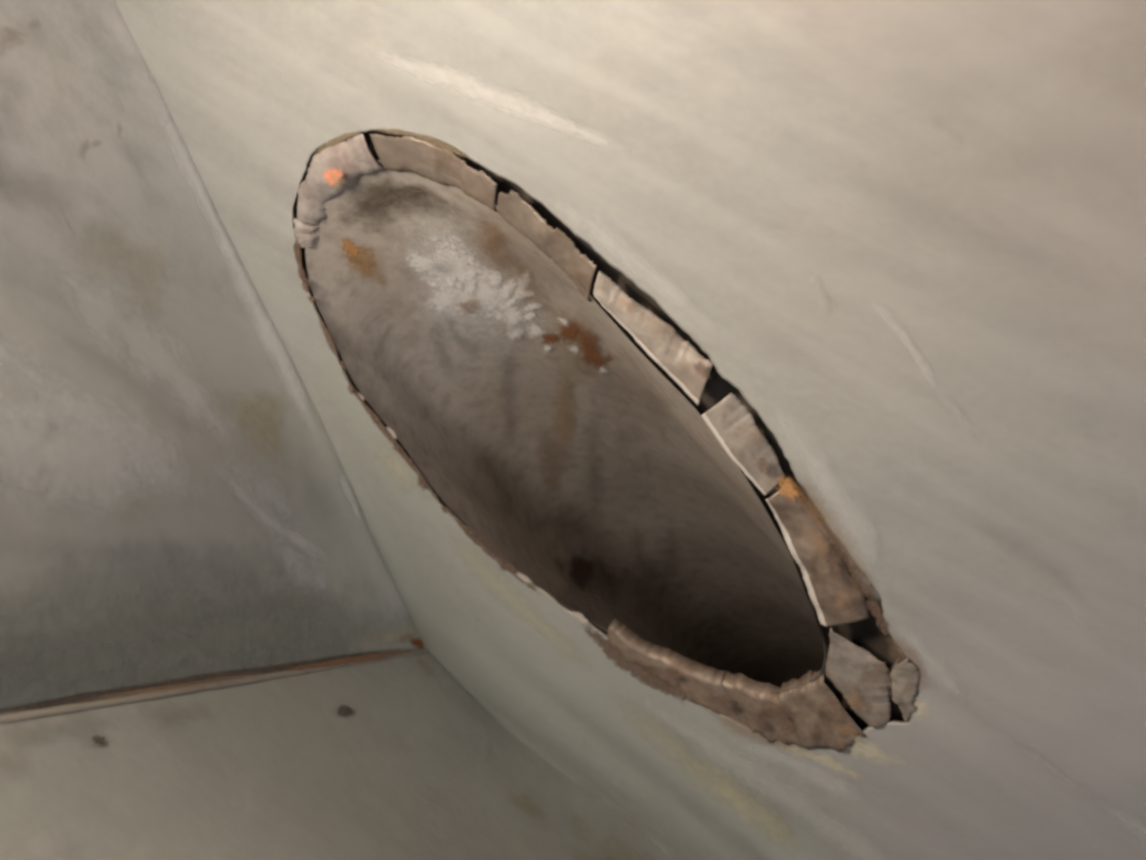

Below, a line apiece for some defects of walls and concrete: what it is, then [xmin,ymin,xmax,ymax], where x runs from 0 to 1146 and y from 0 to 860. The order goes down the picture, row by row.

rust [324,170,342,185]
peeling [405,219,545,358]
rust [542,316,613,374]